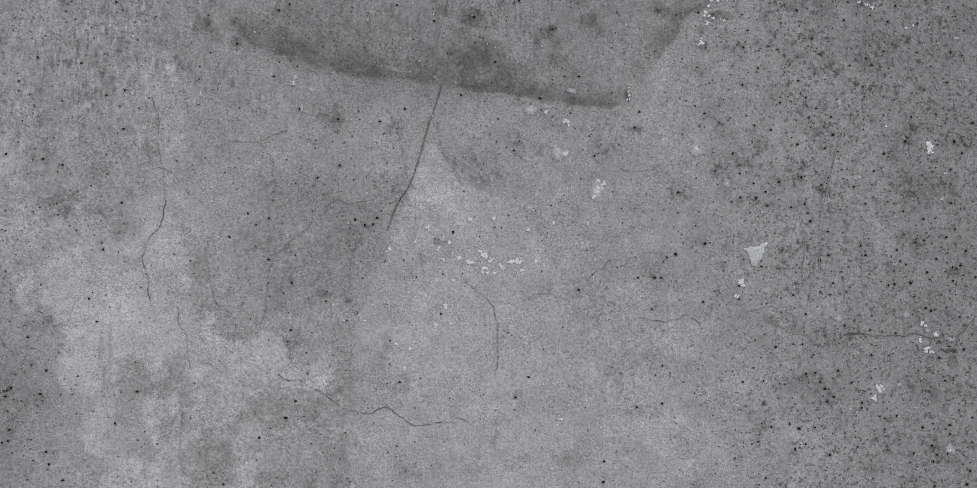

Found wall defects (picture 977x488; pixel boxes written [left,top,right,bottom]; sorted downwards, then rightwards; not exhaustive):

leakage [227,0,708,113]
crack [141,96,172,305]
crack [178,413,188,476]
crack [177,306,191,369]
crack [244,86,449,319]
leakage [0,38,748,488]
crack [273,373,477,426]
crack [460,257,637,378]
leakage [720,365,757,406]
spalling [744,242,768,266]